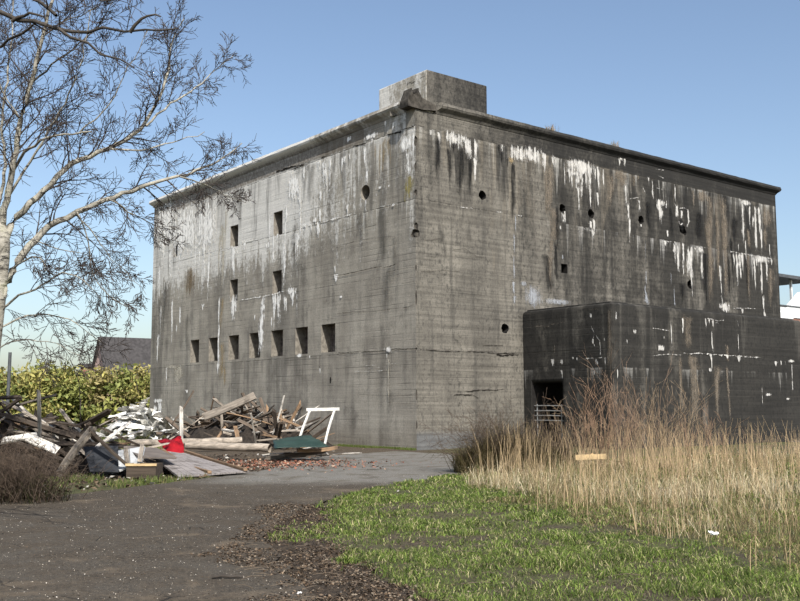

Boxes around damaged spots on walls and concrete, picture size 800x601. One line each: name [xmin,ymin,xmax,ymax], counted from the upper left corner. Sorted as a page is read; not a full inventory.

water stain [430,130,478,187]
water stain [155,195,256,310]
water stain [231,159,350,354]
water stain [498,145,772,321]
water stain [679,339,746,419]